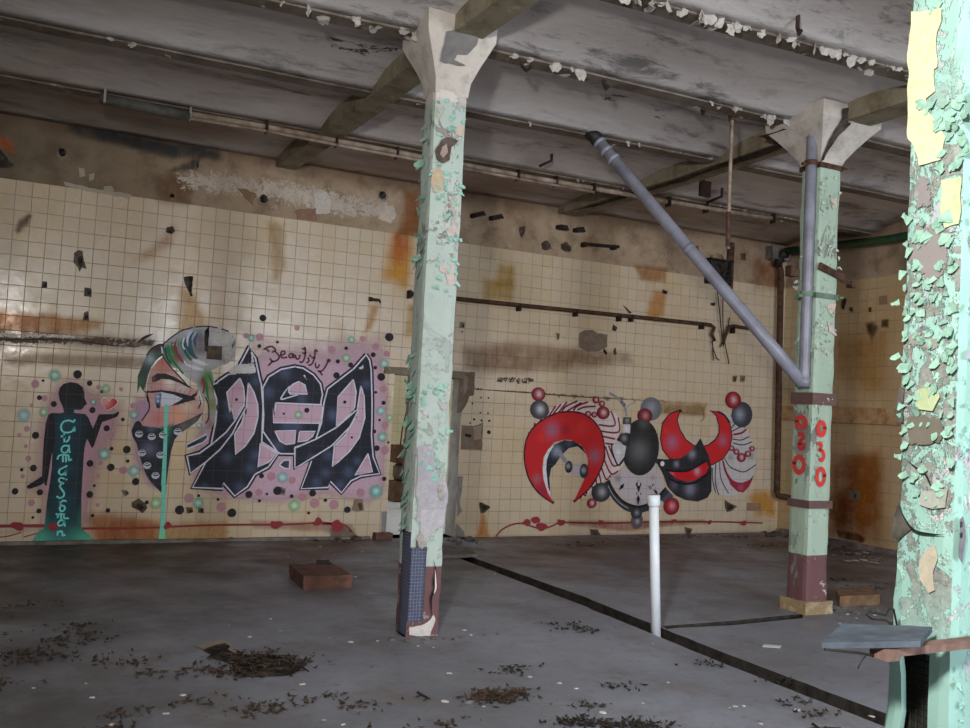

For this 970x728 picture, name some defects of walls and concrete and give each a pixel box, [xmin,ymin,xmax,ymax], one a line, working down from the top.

peeling [306,4,330,25]
peeling [352,16,384,34]
spalling [440,30,478,66]
peeling [549,63,587,81]
spalling [414,98,466,242]
flaking render [170,168,397,223]
peeling [619,0,970,509]
peeling [432,258,460,297]
peeling [725,500,761,512]
peeling [892,503,910,541]
peeling [919,545,938,593]
spalling [409,615,436,636]